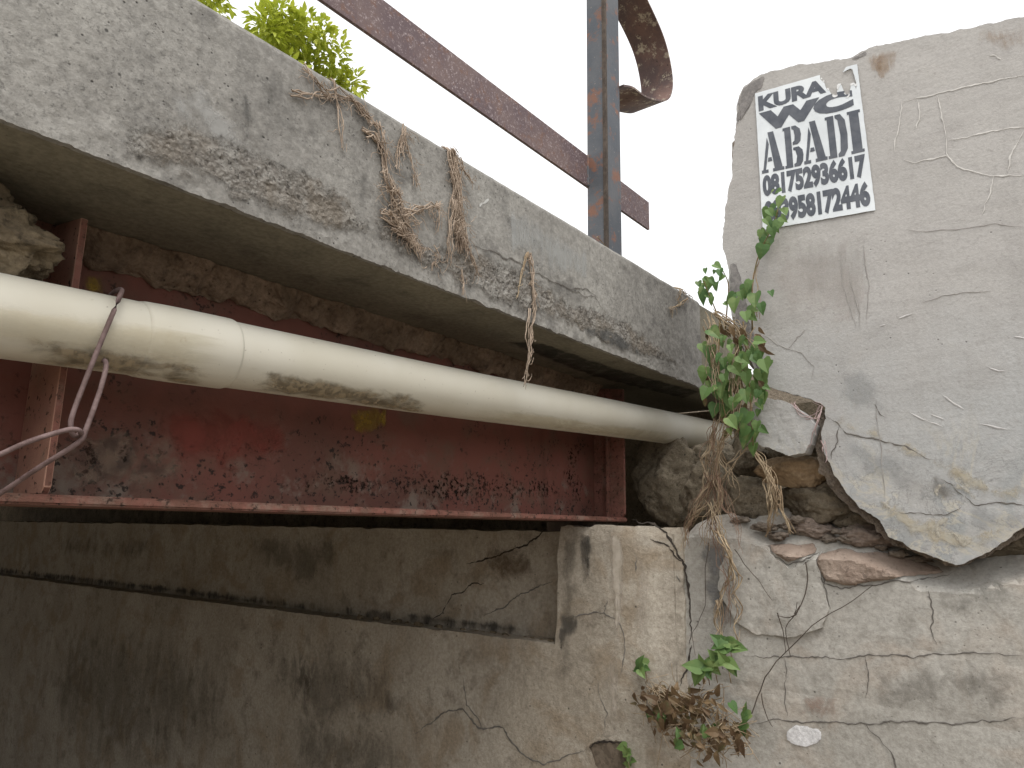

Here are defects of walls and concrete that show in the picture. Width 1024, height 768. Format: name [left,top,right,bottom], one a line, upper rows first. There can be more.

crack [894,75,1024,232]
crack [471,245,600,304]
corrosion [396,472,556,499]
crack [433,530,553,619]
crack [632,519,692,685]
flaking render [768,543,943,585]
crack [565,600,625,726]
crack [743,545,1016,768]
crack [415,680,586,765]